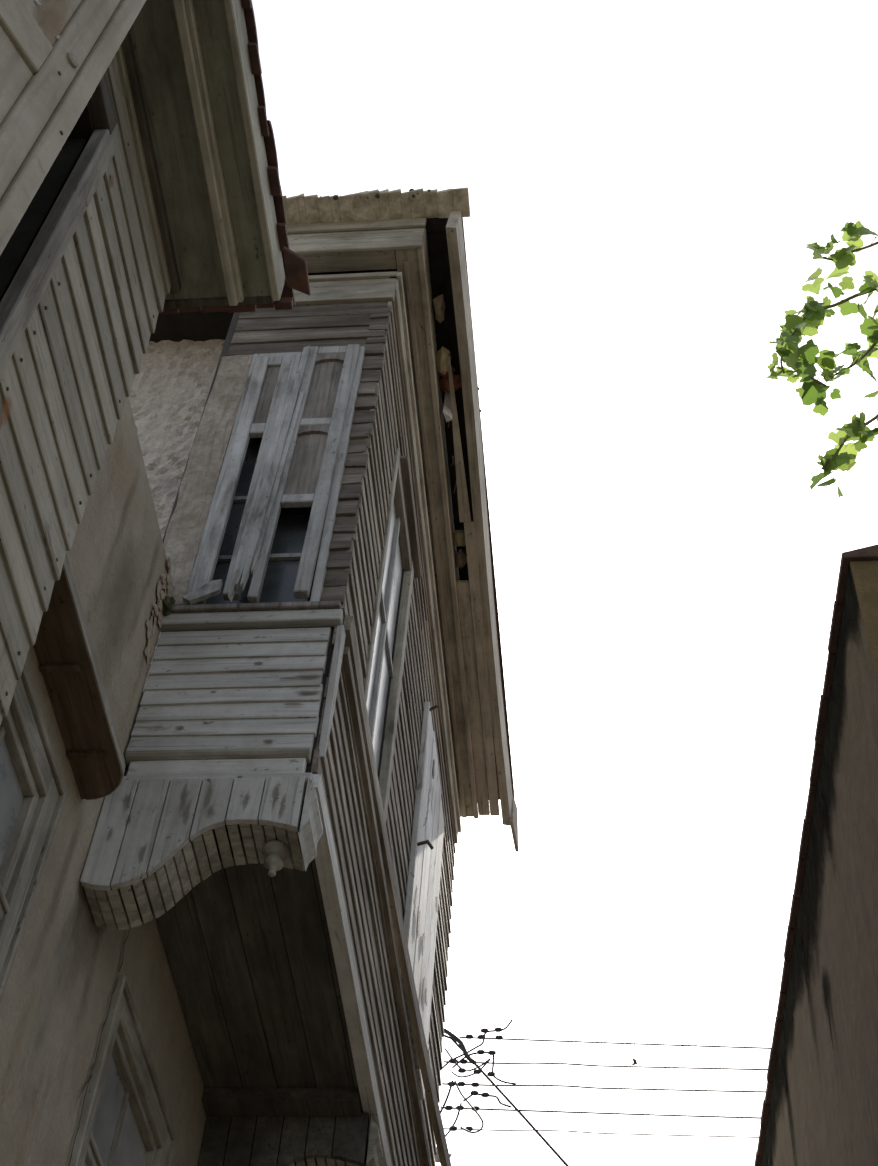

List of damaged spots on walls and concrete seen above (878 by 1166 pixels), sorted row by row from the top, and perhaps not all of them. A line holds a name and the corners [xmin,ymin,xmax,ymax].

crack [69,927,130,1166]